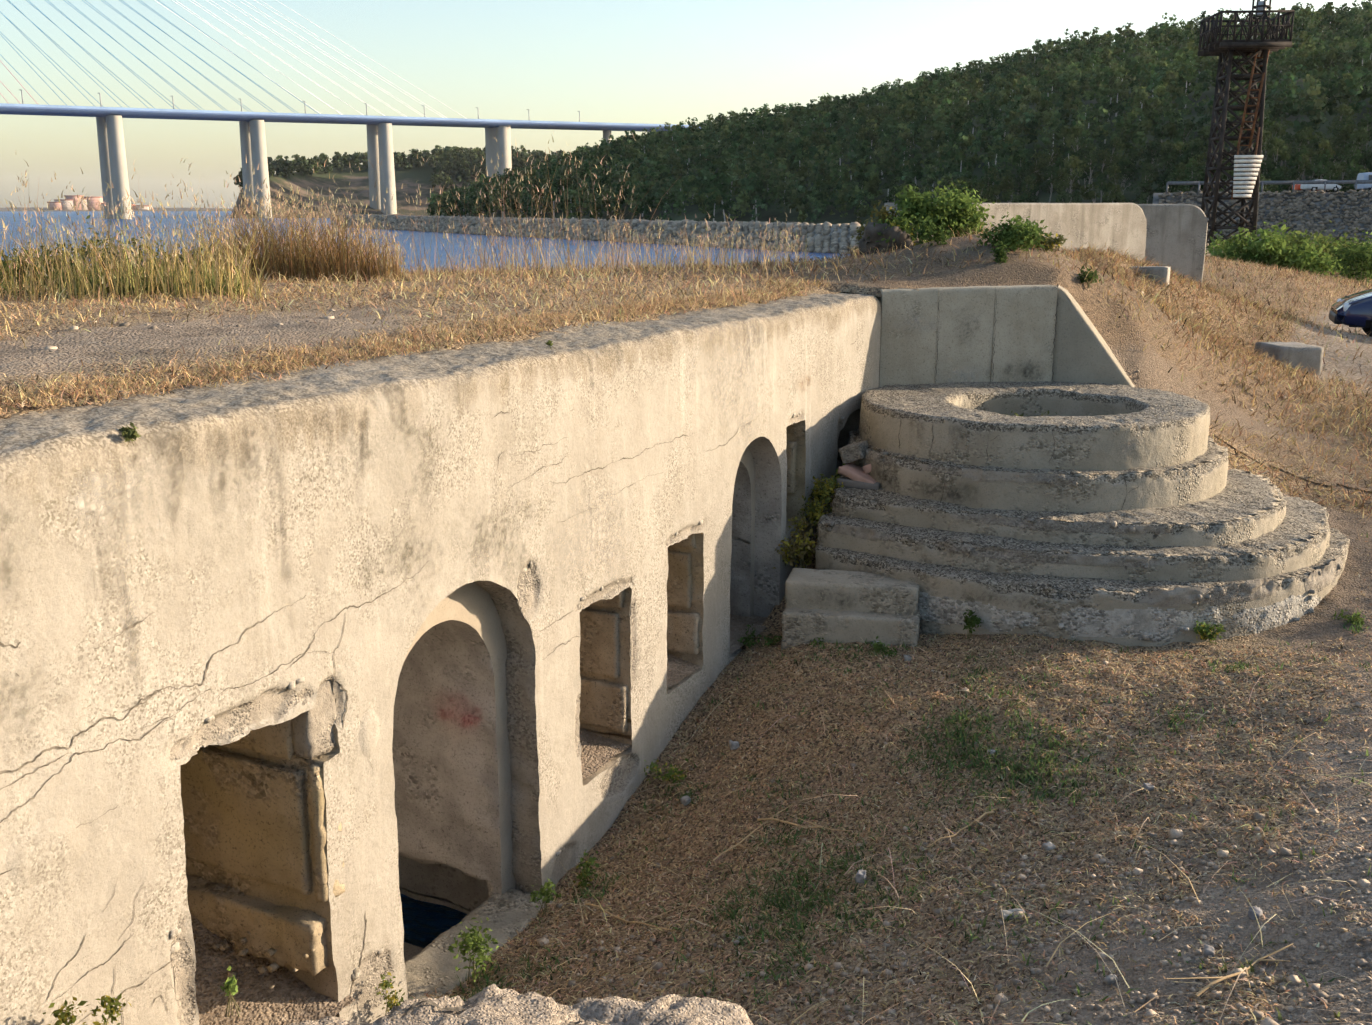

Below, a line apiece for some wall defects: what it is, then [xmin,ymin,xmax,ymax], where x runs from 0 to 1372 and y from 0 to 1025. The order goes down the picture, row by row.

crack [498,413,761,522]
crack [0,565,425,823]
spalling [170,674,346,762]